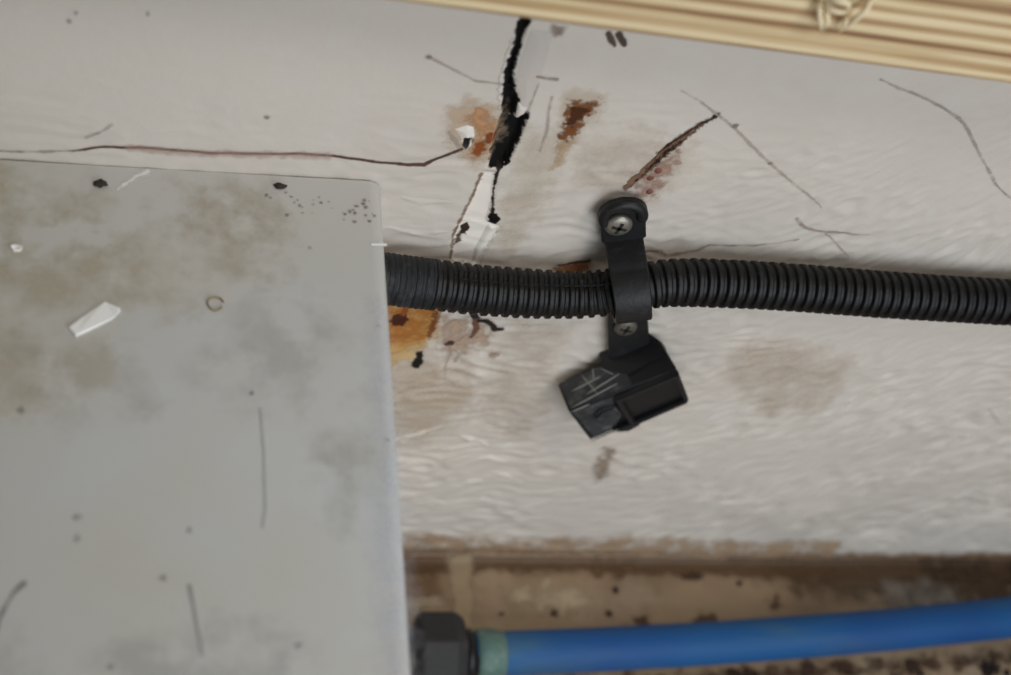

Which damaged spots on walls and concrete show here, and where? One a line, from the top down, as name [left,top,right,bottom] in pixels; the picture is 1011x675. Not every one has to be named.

crack [0,126,463,167]
rust [449,105,497,161]
crack [431,17,559,258]
rust [558,100,598,142]
crack [629,103,812,199]
crack [797,224,848,250]
spalling [412,351,424,369]
leakage [595,449,615,479]
leakage [402,534,1011,606]
leakage [709,651,1011,675]